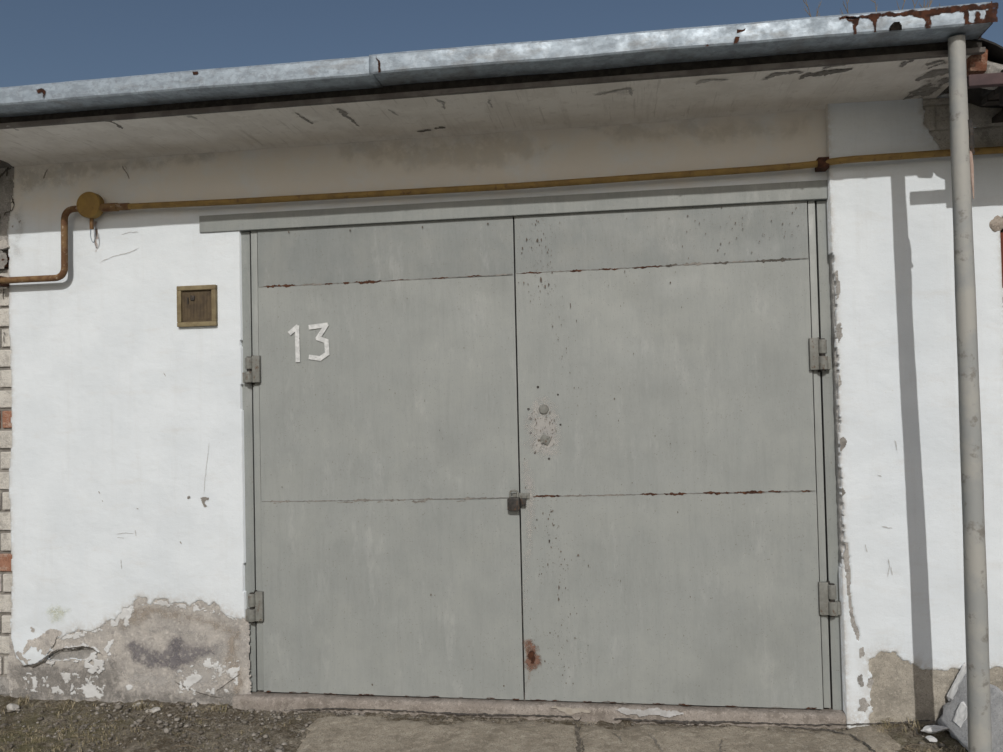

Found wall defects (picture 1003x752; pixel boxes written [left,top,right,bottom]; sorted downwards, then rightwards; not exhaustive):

rust [839,2,999,34]
flaking render [0,240,10,269]
flaking render [829,254,960,726]
flaking render [7,596,251,706]
damp [129,637,242,691]
rust [525,640,549,673]
flaking render [990,667,1003,691]